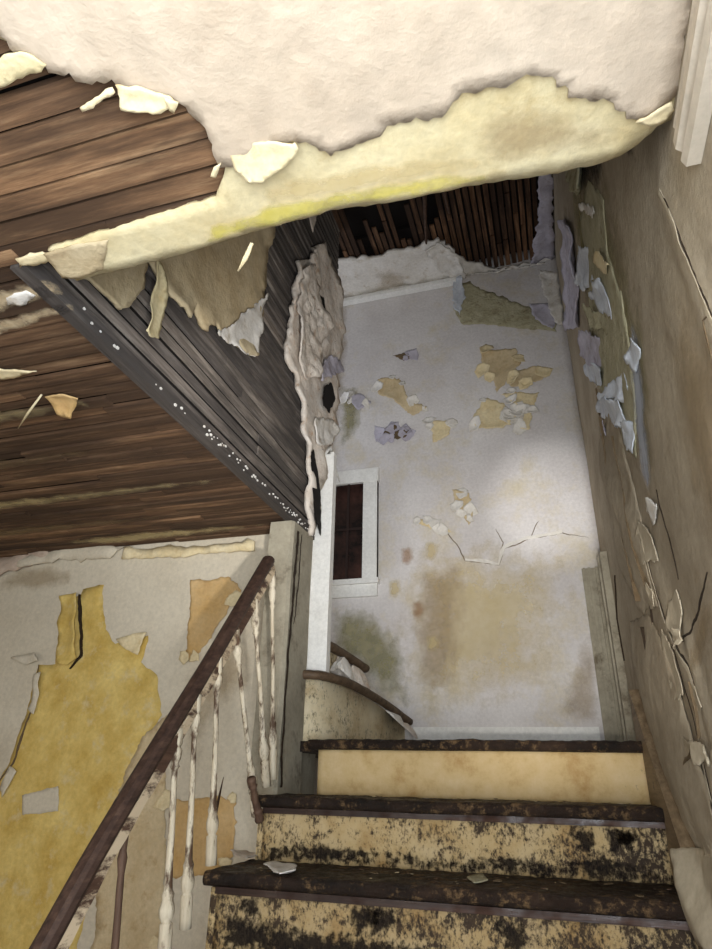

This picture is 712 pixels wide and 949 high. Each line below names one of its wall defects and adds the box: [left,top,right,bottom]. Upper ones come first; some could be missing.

peeling [0,51,46,88]
peeling [80,84,179,115]
peeling [15,227,276,357]
flaking render [284,167,641,536]
crack [658,188,712,361]
crack [614,490,712,803]
peeling [0,585,167,949]
peeling [69,772,297,949]
leakage [222,898,420,949]
leakage [266,827,660,882]
leakage [493,920,527,949]
peeling [670,842,712,949]